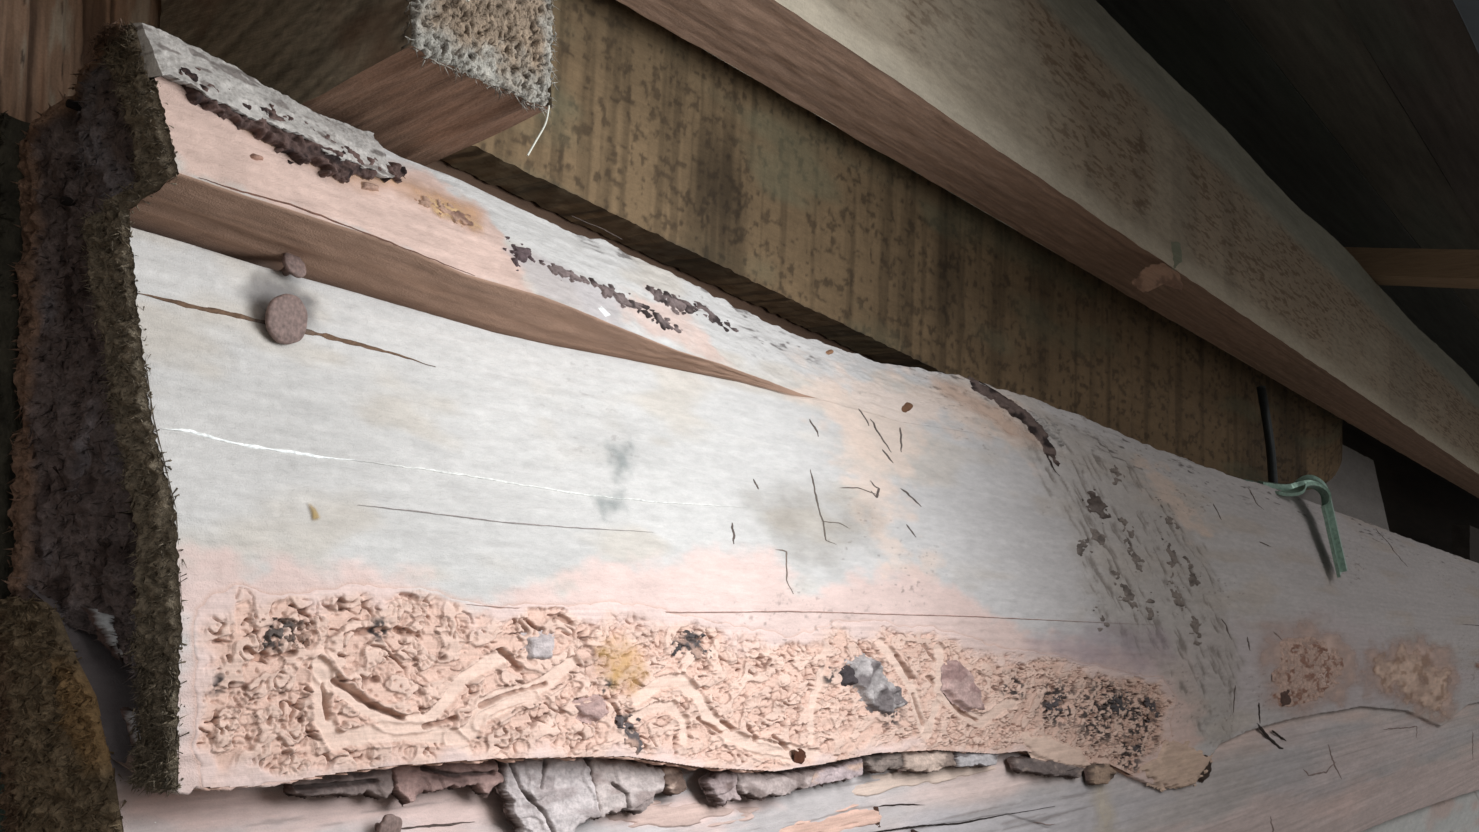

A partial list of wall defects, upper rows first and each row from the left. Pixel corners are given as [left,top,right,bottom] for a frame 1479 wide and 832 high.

crack [138,293,265,324]
crack [305,329,435,367]
peeling [1013,731,1091,768]
peeling [1138,740,1214,792]
crack [401,821,469,829]
crack [873,804,1054,832]